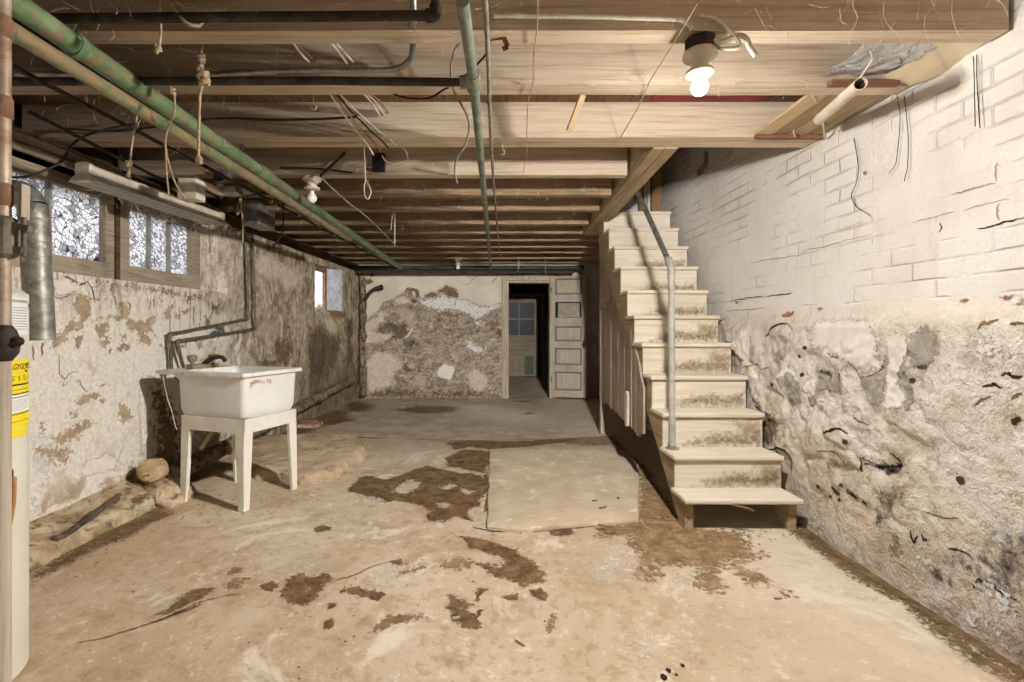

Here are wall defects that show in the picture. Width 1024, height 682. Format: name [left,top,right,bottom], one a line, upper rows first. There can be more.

peeling [50,276,204,354]
water stain [259,337,294,367]
water stain [306,275,360,388]
spalling [365,285,502,396]
peeling [770,315,939,411]
peeling [964,334,1010,367]
peeling [33,392,106,468]
peeling [117,401,134,425]
water stain [344,388,582,523]
crack [818,416,869,466]
spalling [816,483,866,505]